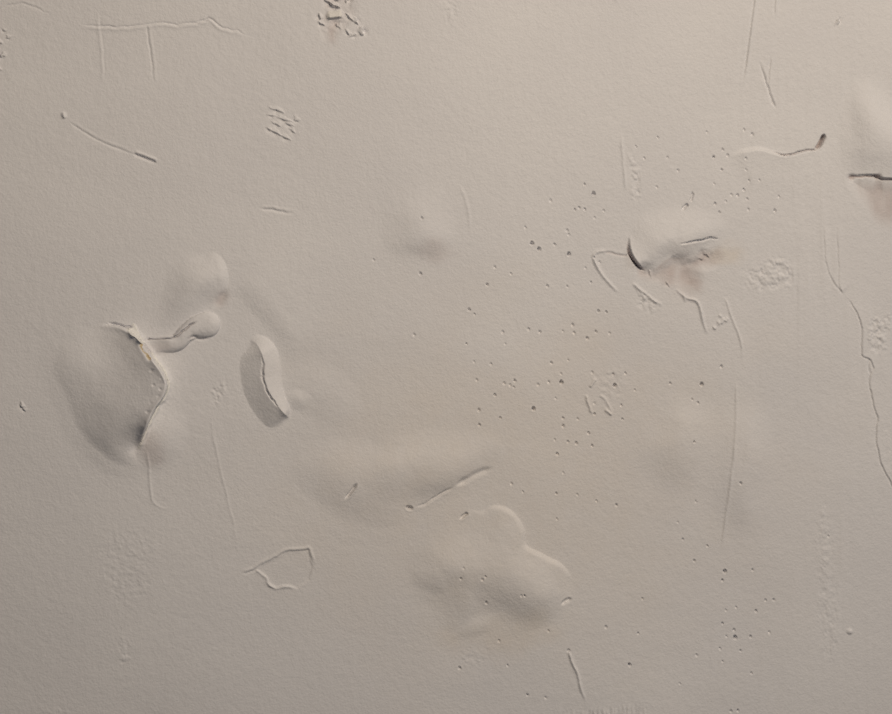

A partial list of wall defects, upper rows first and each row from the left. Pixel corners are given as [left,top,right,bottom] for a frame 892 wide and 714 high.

crack [76,9,251,89]
peeling [319,0,364,43]
crack [767,131,827,157]
crack [822,219,892,488]